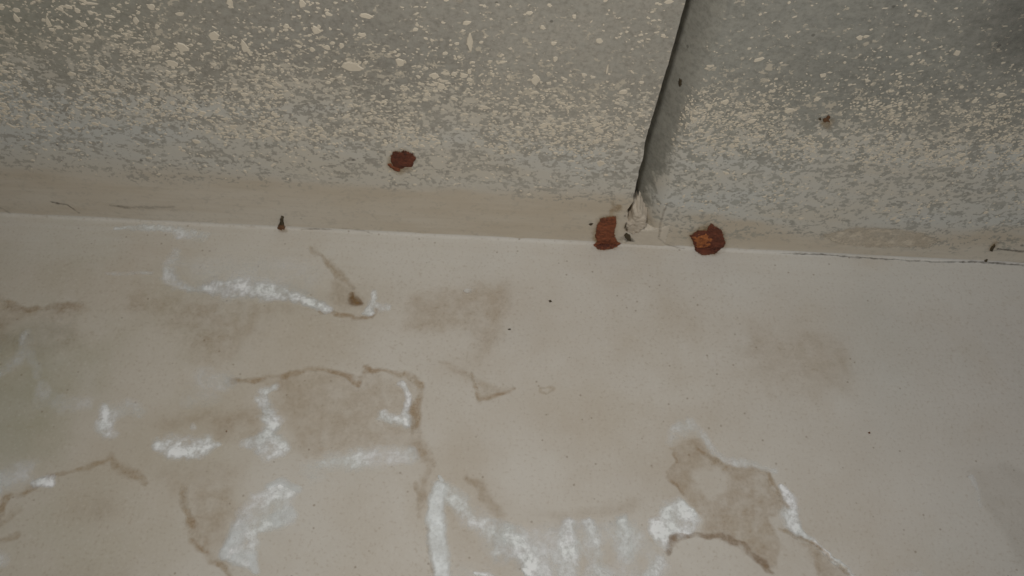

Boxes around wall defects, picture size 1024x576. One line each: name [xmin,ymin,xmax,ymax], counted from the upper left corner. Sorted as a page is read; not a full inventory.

peeling [572,0,674,50]
peeling [0,0,656,196]
rust [388,150,416,172]
rust [593,216,620,250]
rust [690,224,726,255]
damp [203,278,332,312]
damp [152,437,221,459]
damp [245,385,290,460]
damp [220,482,296,573]
damp [426,475,611,576]
damp [616,498,699,576]
damp [779,484,853,576]